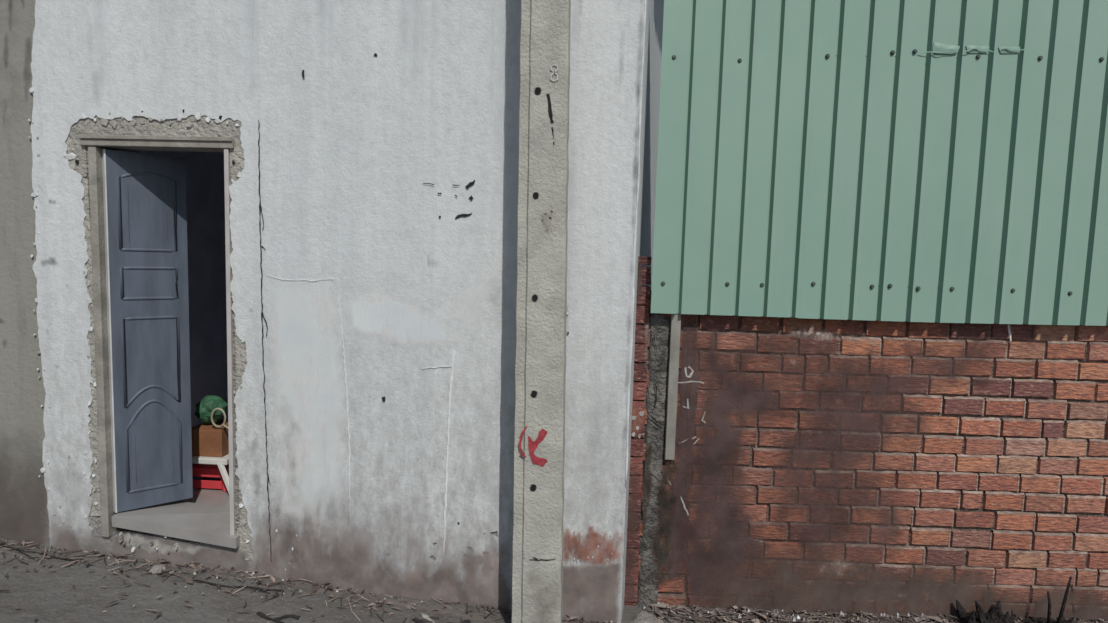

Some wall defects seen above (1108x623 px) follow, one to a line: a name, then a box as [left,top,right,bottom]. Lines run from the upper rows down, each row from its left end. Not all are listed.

damp [0,459,511,620]
damp [562,550,636,623]